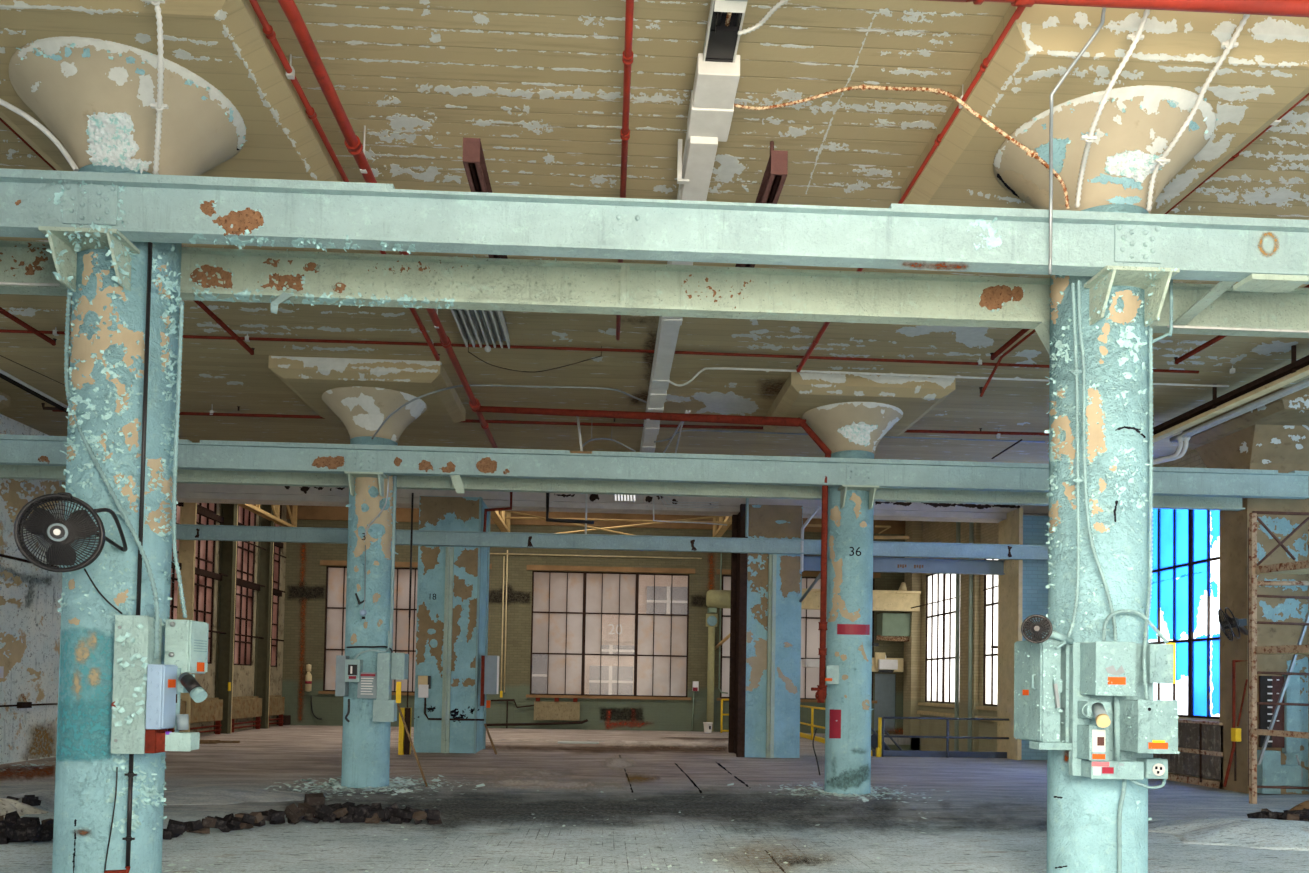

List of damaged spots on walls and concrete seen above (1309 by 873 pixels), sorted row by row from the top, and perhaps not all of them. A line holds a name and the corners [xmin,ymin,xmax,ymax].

peeling [0,9,317,180]
peeling [709,8,967,194]
peeling [967,12,1309,213]
corrosion [189,264,233,290]
peeling [0,234,455,772]
corrosion [199,200,264,239]
corrosion [260,258,319,291]
corrosion [312,456,345,470]
corrosion [476,457,510,474]
peeling [731,275,1072,452]
corrosion [979,285,1025,312]
peeling [1046,290,1298,562]